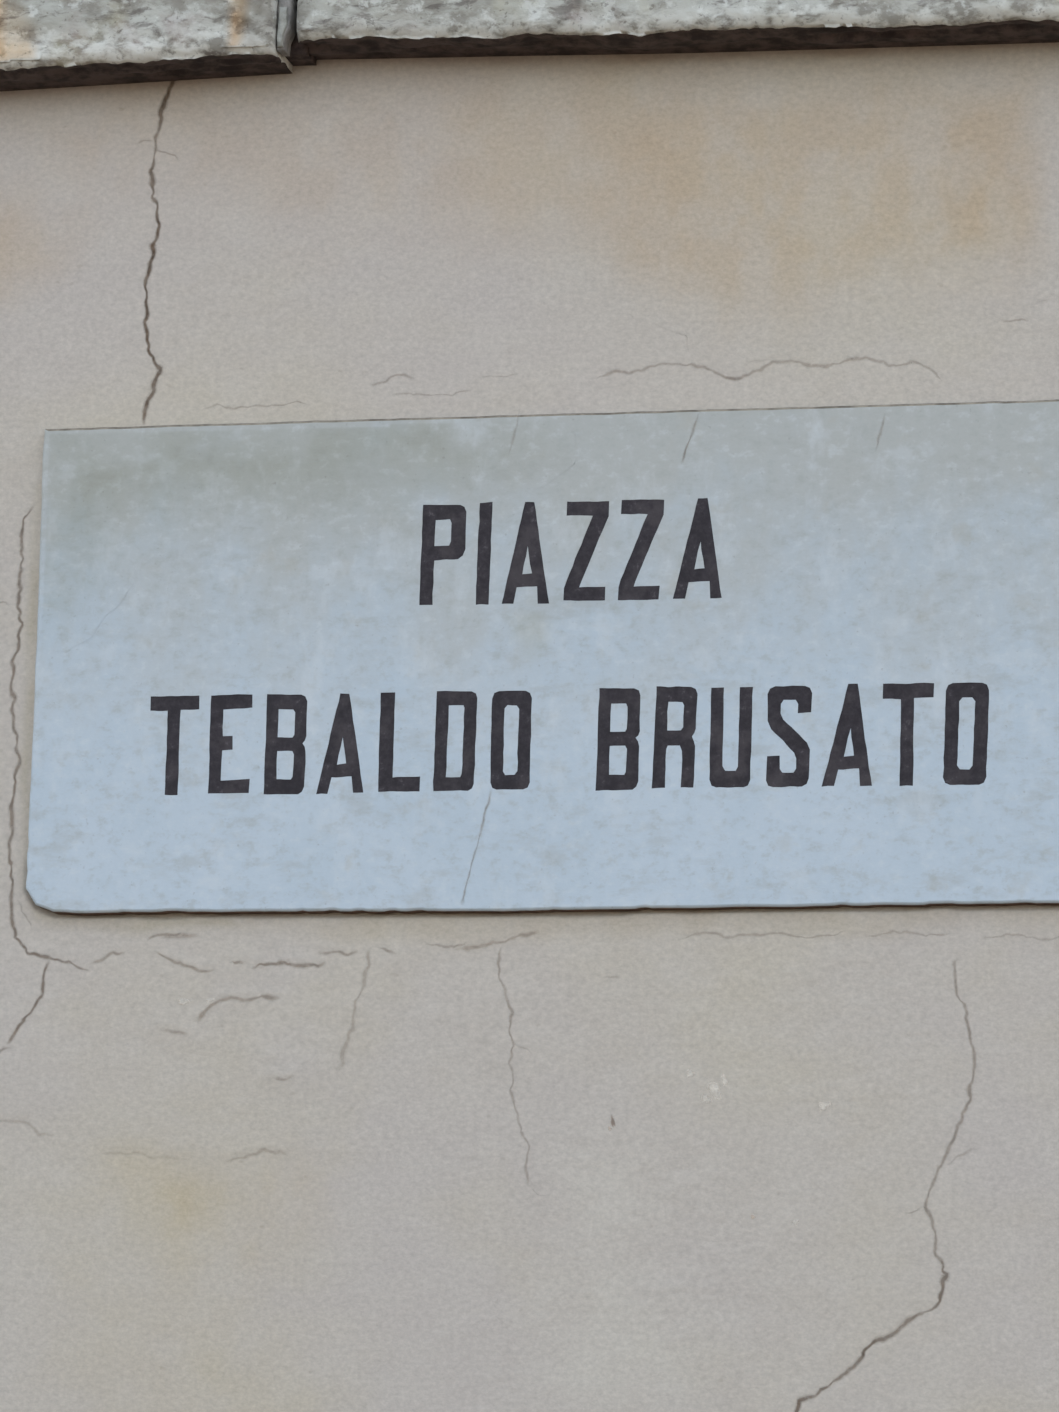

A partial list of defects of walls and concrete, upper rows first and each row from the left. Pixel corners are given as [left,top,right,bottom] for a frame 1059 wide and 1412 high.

crack [143,81,174,420]
crack [8,511,76,1041]
crack [795,1254,948,1412]